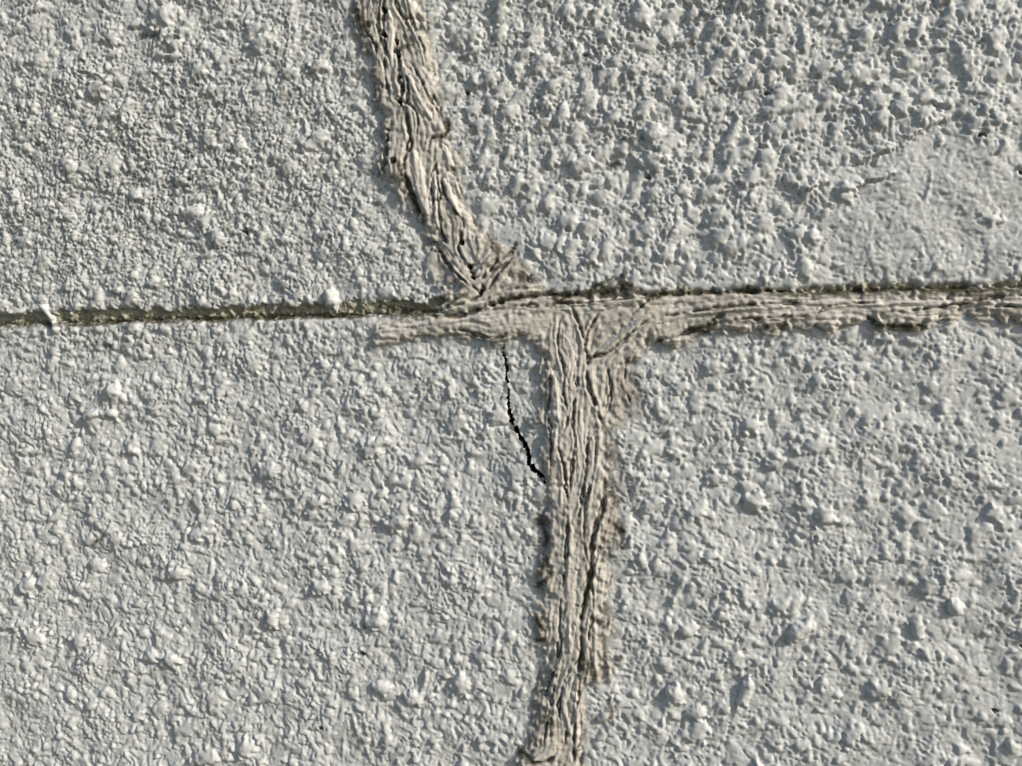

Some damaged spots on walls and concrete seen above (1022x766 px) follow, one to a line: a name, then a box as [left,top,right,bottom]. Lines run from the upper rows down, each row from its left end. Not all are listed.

crack [502,342,546,484]